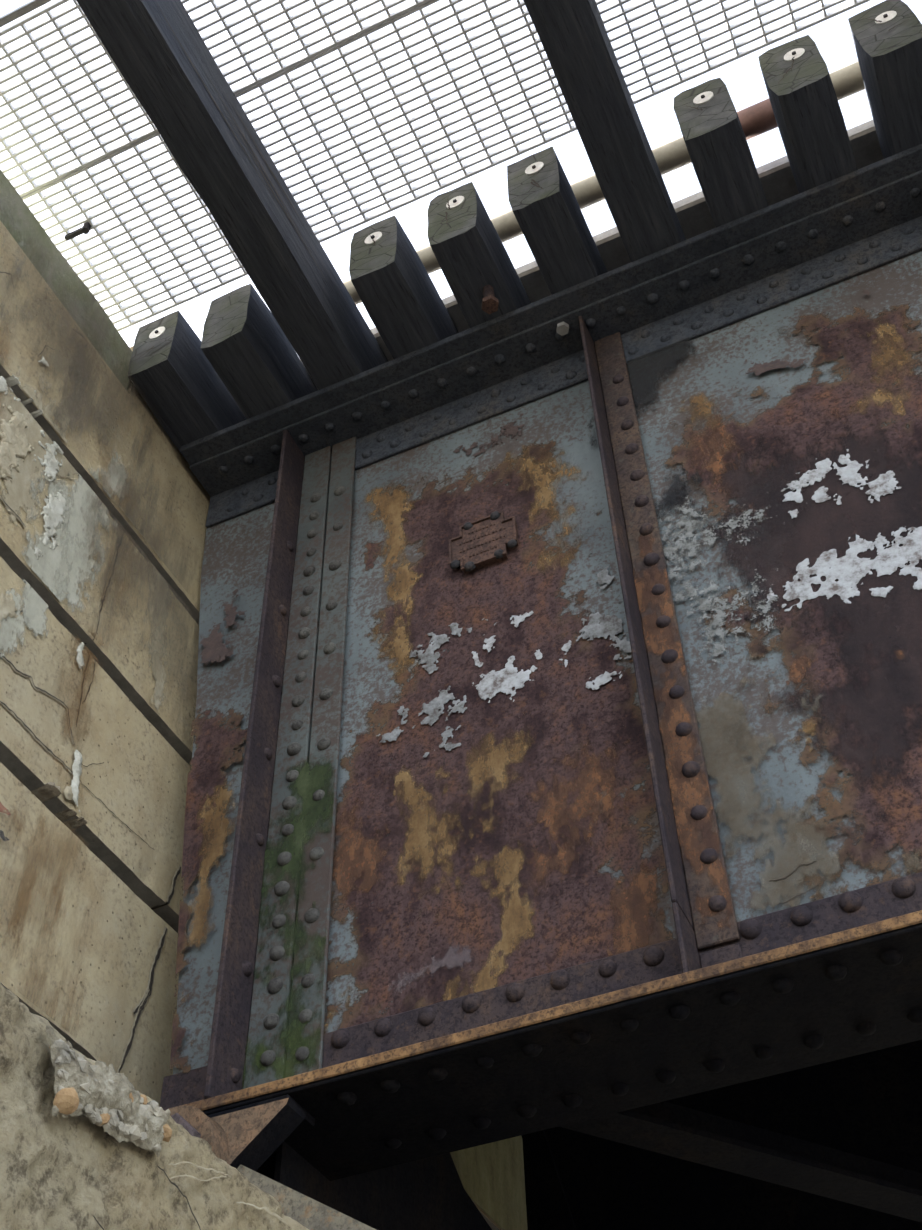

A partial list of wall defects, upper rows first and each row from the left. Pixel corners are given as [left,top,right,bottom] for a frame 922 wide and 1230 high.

crack [0,495,26,528]
peeling [0,353,78,525]
crack [0,531,153,849]
crack [117,865,181,1073]
rust [170,708,248,1073]
leakage [259,761,334,934]
peeling [376,611,542,757]
rust [324,413,675,1033]
peeling [559,612,632,690]
rust [633,535,733,927]
peeling [657,449,922,686]
rust [663,303,922,900]